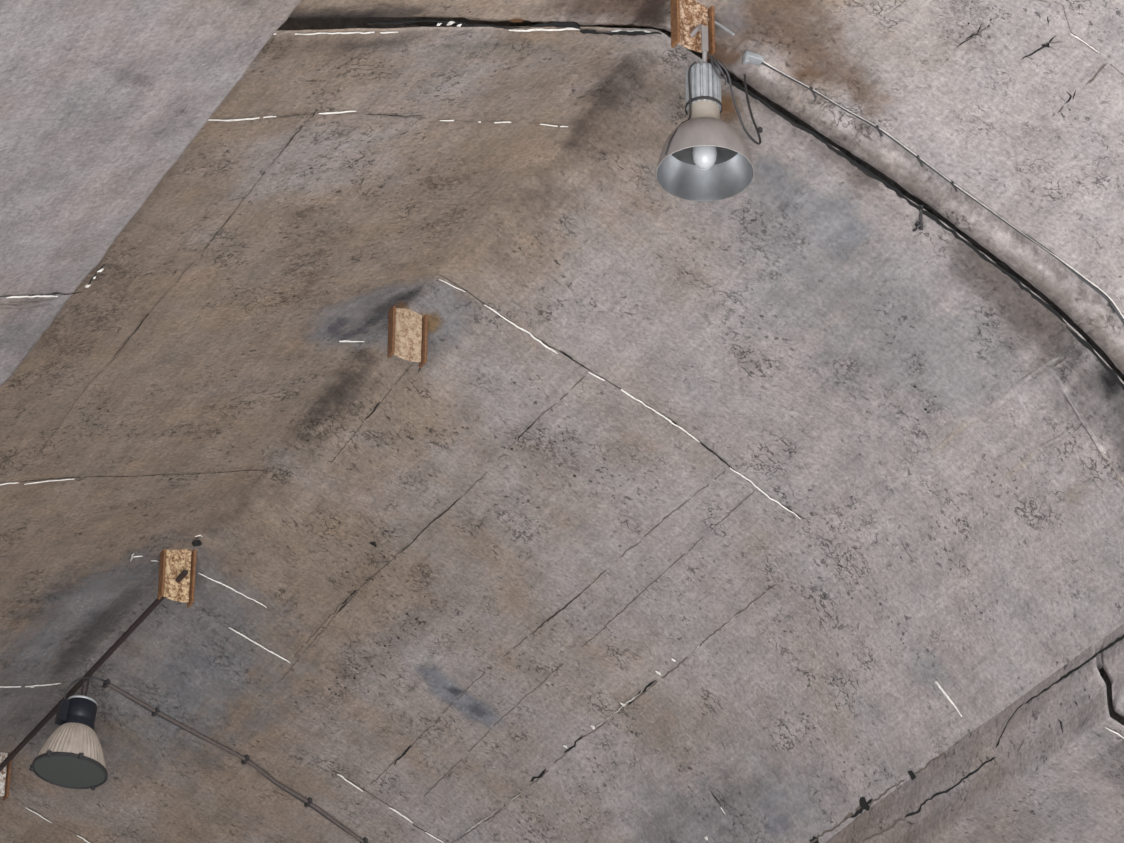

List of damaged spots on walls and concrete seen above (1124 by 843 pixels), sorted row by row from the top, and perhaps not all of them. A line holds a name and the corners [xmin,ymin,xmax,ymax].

crack [312,5,662,36]
damp [744,73,790,105]
damp [803,113,944,207]
damp [313,284,462,346]
damp [1019,266,1124,415]
crack [192,275,804,843]
damp [0,560,250,746]
crack [810,634,1124,843]